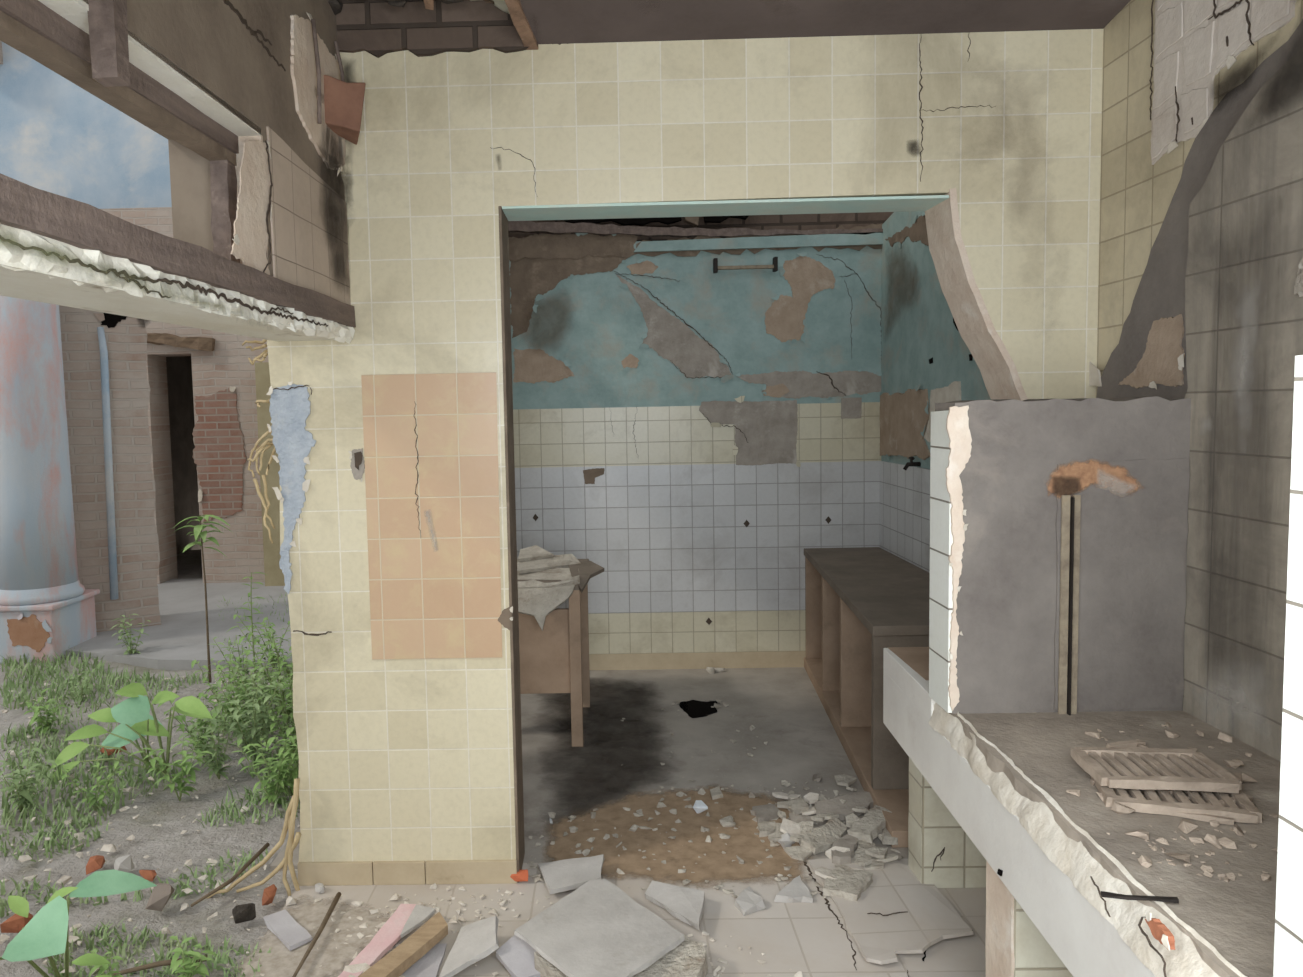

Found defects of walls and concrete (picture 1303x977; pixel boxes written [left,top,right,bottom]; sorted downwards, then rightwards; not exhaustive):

crack [1149,0,1180,142]
peeling [1151,0,1297,165]
crack [1208,0,1254,46]
crack [263,140,273,272]
crack [0,235,328,327]
spalling [192,386,246,524]
spalling [266,381,316,594]
peeling [7,613,53,652]
spalling [508,188,1247,977]
damp [550,680,659,822]
crack [803,862,908,970]
crack [1090,876,1167,977]